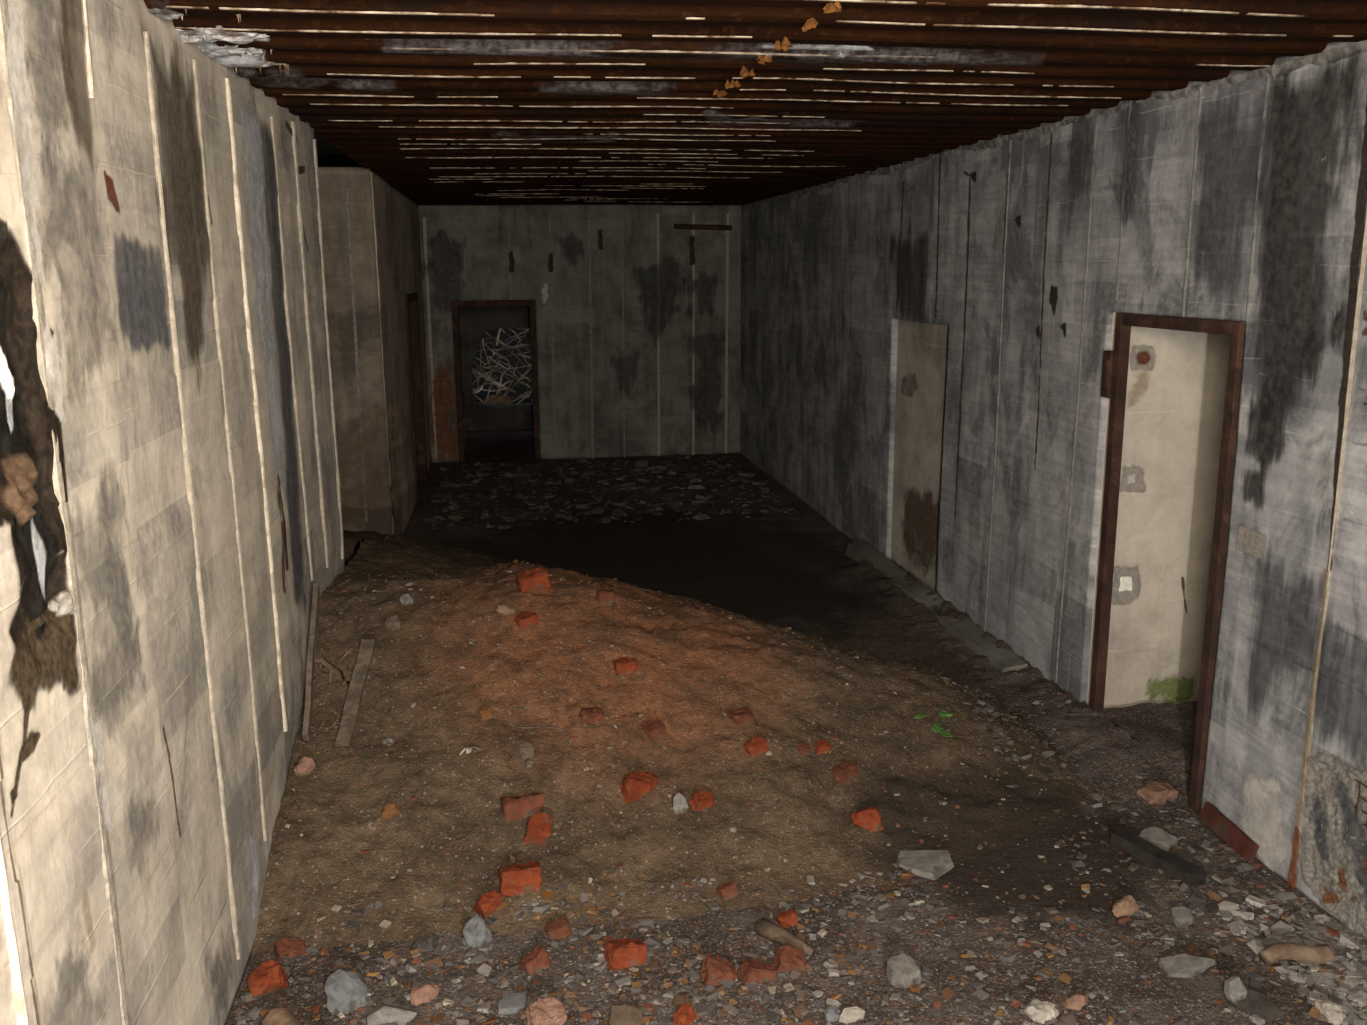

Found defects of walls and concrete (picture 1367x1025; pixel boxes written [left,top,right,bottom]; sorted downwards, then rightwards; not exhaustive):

leakage [988,4,1305,17]
spalling [6,0,45,285]
leakage [25,0,210,382]
leakage [150,6,1140,224]
spalling [43,322,64,421]
leakage [1301,307,1346,372]
leakage [1244,463,1266,507]
spalling [1301,753,1367,940]